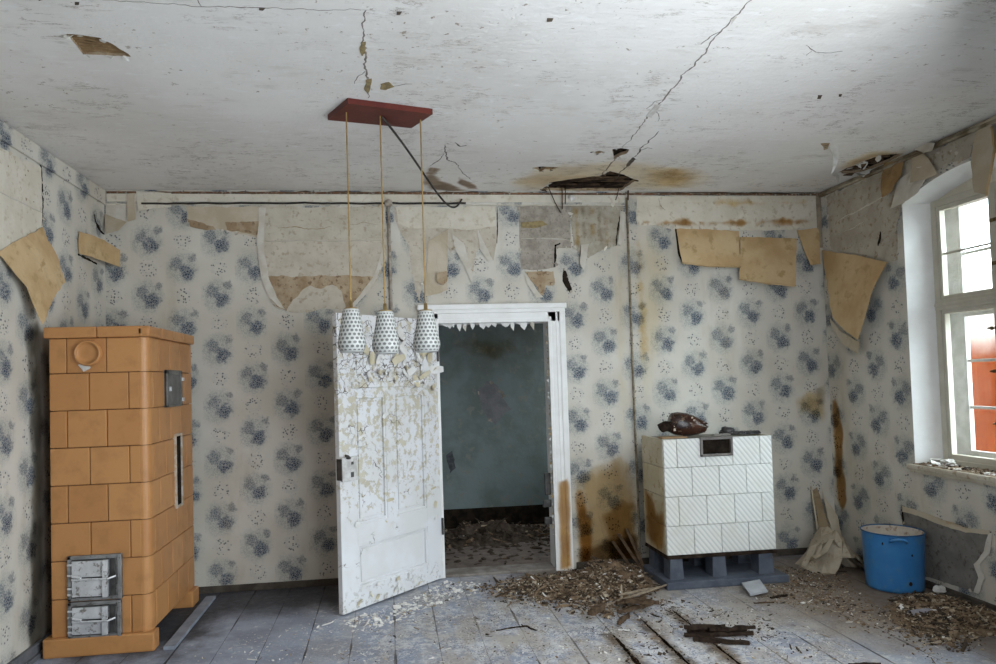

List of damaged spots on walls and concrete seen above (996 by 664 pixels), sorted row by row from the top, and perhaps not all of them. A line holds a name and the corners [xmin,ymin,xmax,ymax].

spalling [63,34,129,61]
crack [115,0,405,98]
crack [602,0,751,179]
crack [429,142,533,193]
spalling [554,262,573,293]